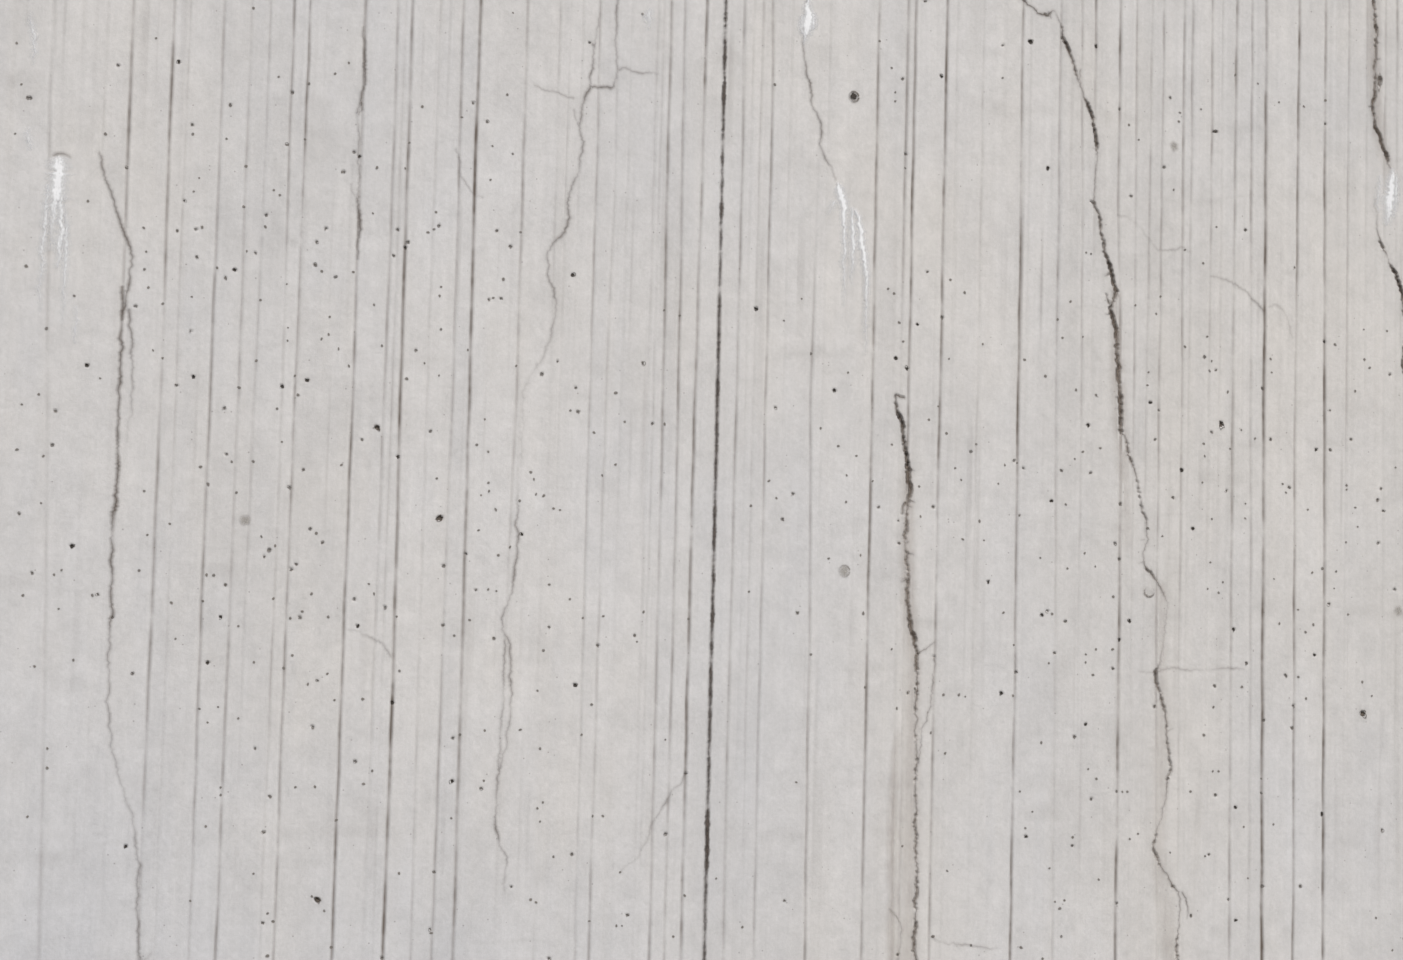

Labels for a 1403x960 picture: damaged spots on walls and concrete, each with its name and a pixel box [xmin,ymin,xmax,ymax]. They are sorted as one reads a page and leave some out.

crack [1023,0,1098,151]
crack [1372,0,1388,162]
damp [40,157,68,294]
damp [833,183,868,321]
crack [1092,202,1135,470]
damp [1377,169,1398,222]
crack [1379,237,1403,302]
crack [111,461,119,516]
crack [895,395,918,706]
crack [911,881,919,960]